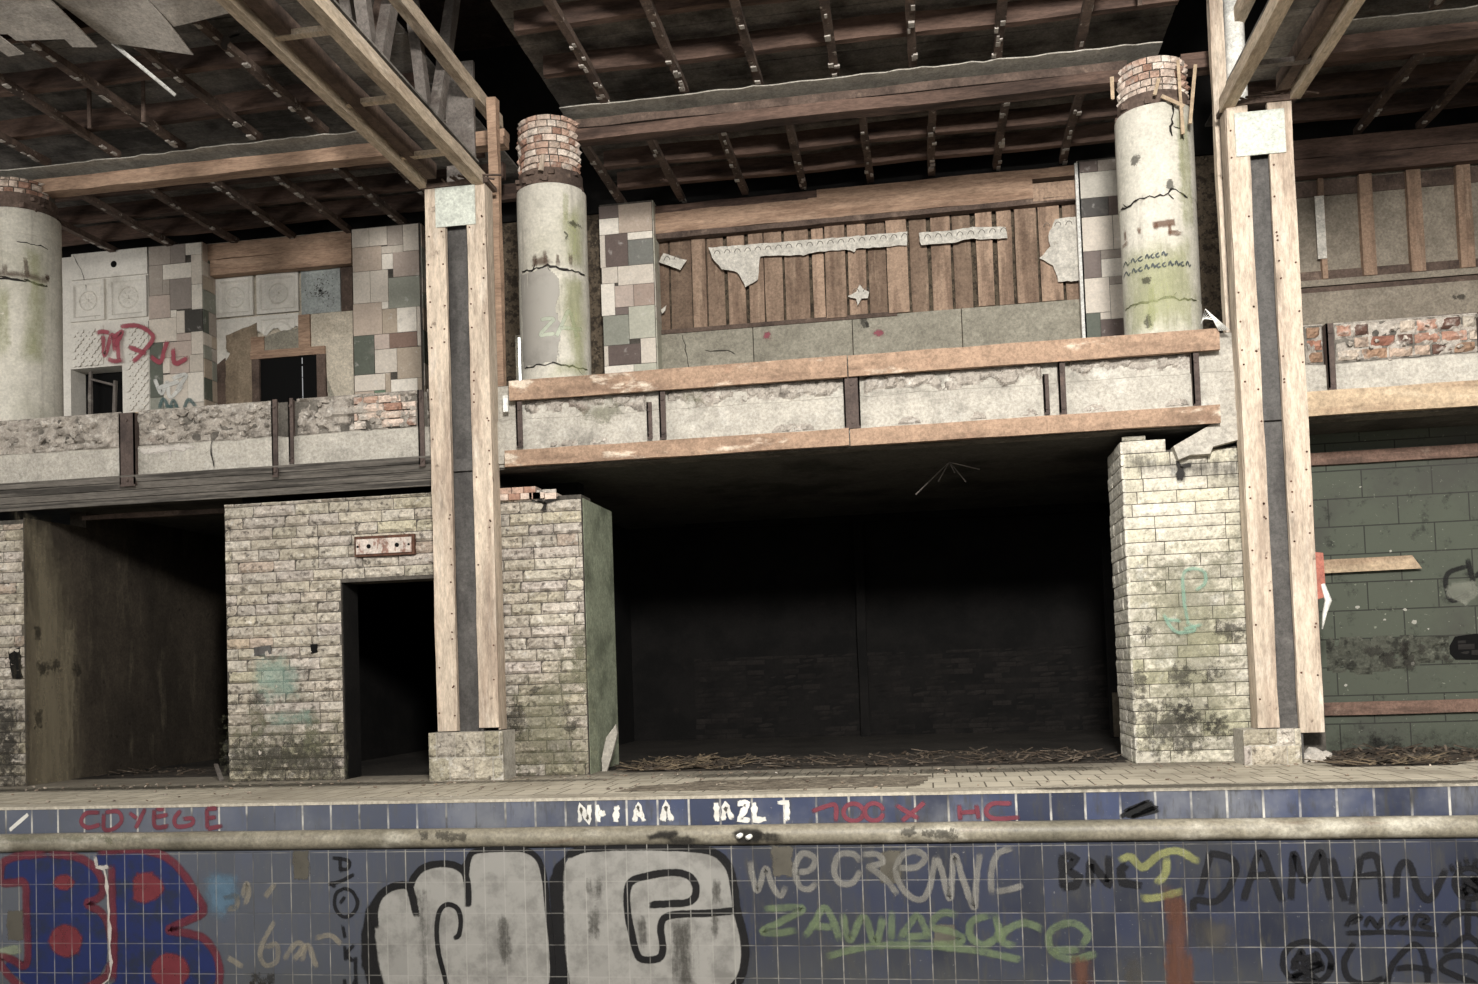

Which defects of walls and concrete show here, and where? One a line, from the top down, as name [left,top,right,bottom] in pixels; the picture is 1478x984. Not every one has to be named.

crack [1121,188,1188,210]
crack [0,241,86,287]
leakage [1214,619,1246,643]
leakage [0,534,594,792]
leakage [1124,660,1233,757]
leakage [688,767,1099,778]